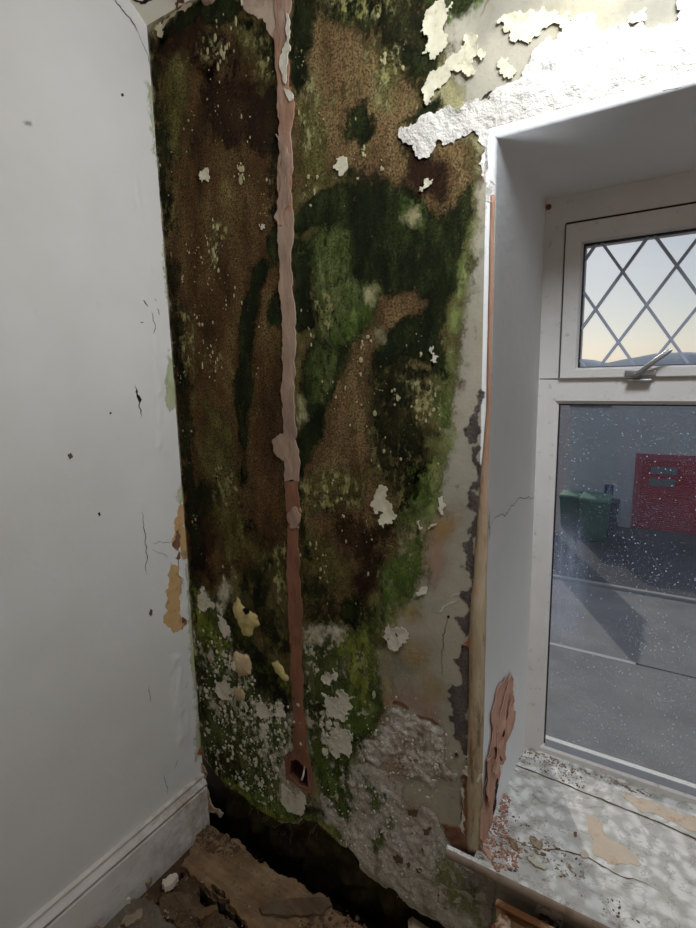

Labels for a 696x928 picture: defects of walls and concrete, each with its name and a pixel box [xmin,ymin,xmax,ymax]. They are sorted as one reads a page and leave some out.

crack [115,0,152,64]
flaking render [154,0,194,38]
flaking render [241,0,294,102]
peeling [398,0,696,202]
damp [147,0,487,819]
flaking render [163,389,496,928]